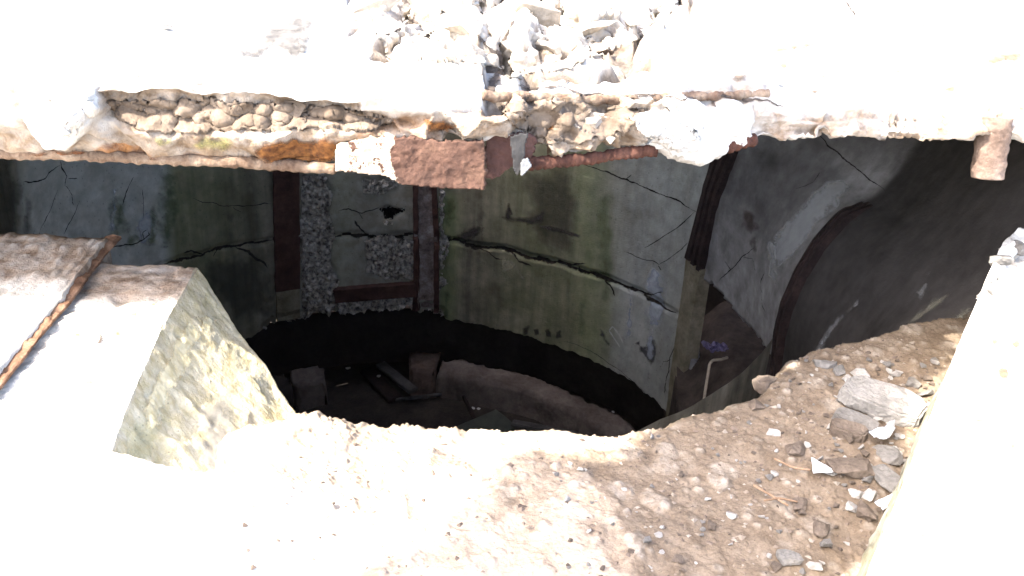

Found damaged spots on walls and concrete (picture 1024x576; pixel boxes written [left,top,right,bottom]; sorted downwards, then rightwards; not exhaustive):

spalling [353,0,680,82]
spalling [107,85,393,135]
corrosion [255,138,337,163]
spalling [498,95,646,155]
crack [820,136,881,187]
crack [25,164,79,234]
crack [165,240,270,267]
spalling [287,173,444,322]
leakage [505,175,579,247]
crack [448,165,694,320]